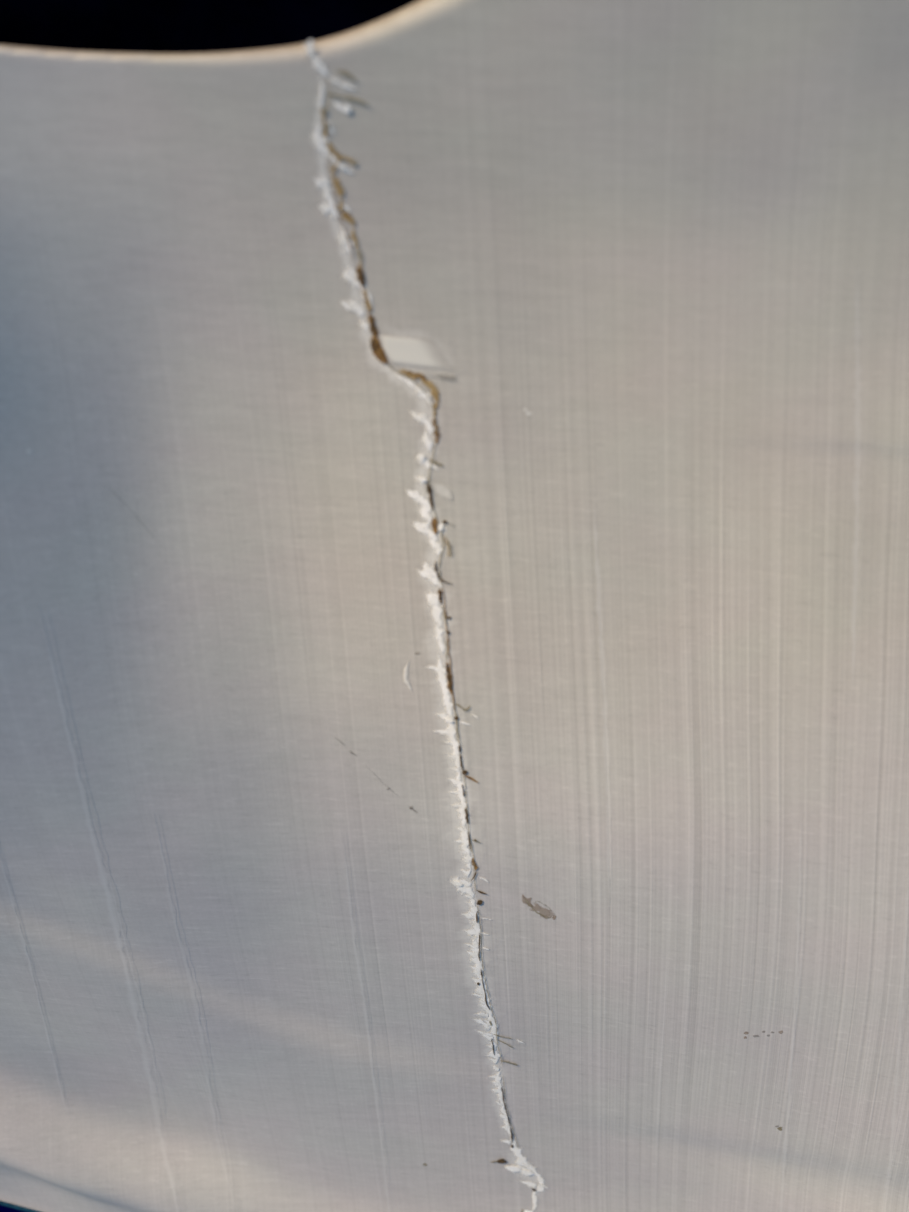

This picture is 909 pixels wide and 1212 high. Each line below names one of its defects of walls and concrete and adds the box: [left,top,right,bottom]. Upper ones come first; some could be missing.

crack [305,40,549,1212]